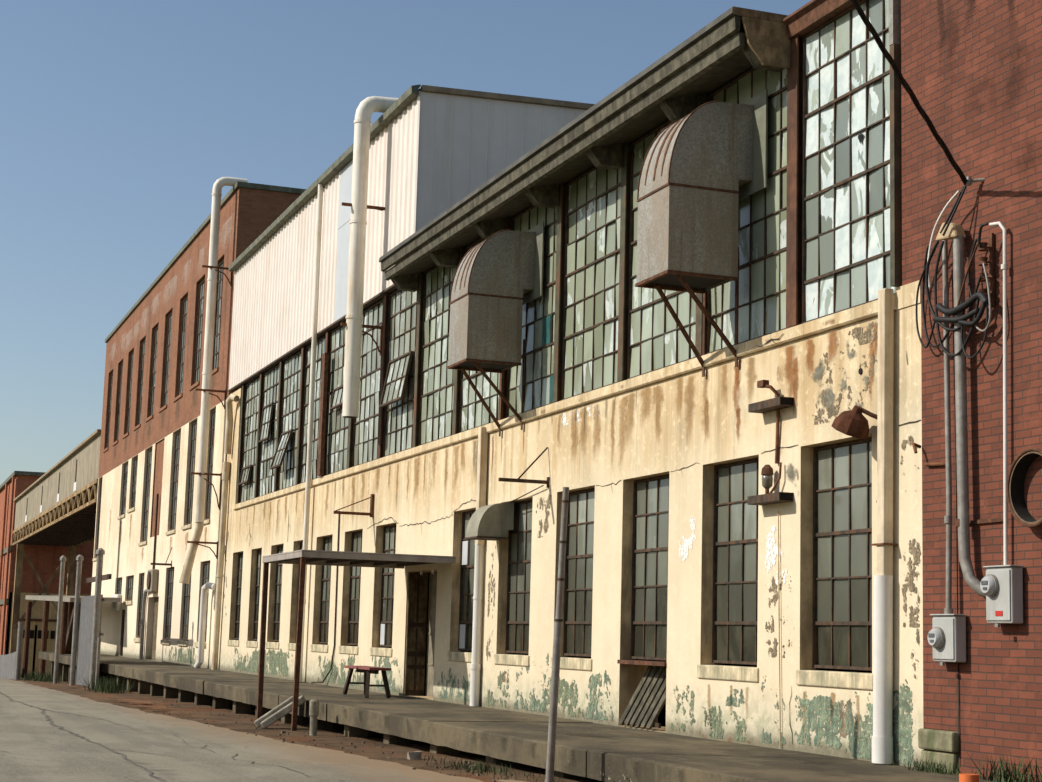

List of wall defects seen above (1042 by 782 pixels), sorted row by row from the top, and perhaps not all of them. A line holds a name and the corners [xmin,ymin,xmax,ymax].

peeling [812,321,878,425]
crack [367,499,476,535]
peeling [537,495,551,538]
peeling [893,538,920,765]